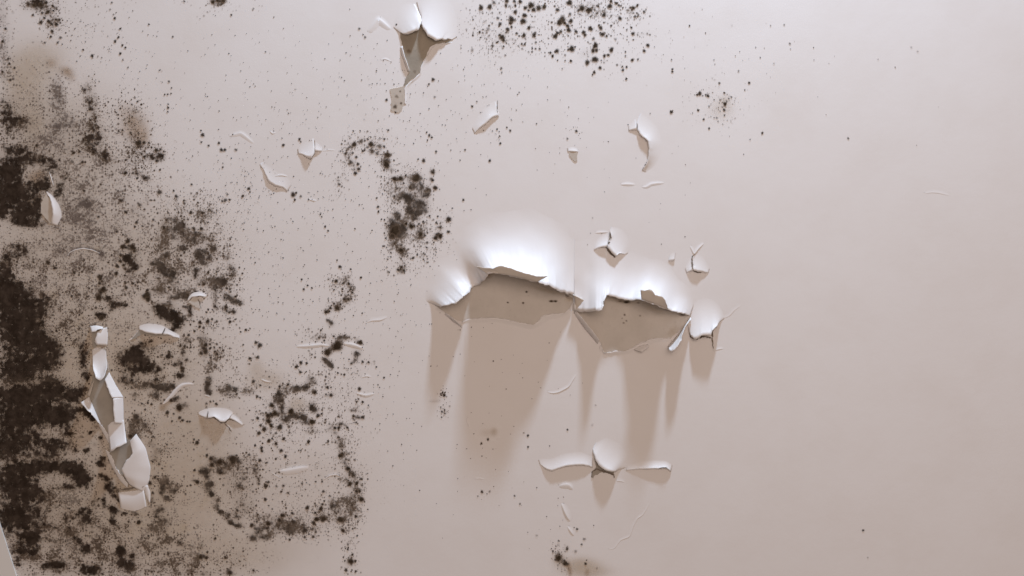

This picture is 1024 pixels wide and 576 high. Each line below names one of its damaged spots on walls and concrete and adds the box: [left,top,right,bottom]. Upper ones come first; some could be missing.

peeling [368,0,458,113]
mould [457,0,674,82]
peeling [297,138,335,160]
peeling [472,101,499,134]
peeling [628,114,662,172]
peeling [41,191,64,227]
damp [0,0,472,576]
peeling [425,208,725,356]
peeling [128,322,180,341]
peeling [81,325,151,511]
peeling [197,406,245,432]
peeling [538,438,673,482]